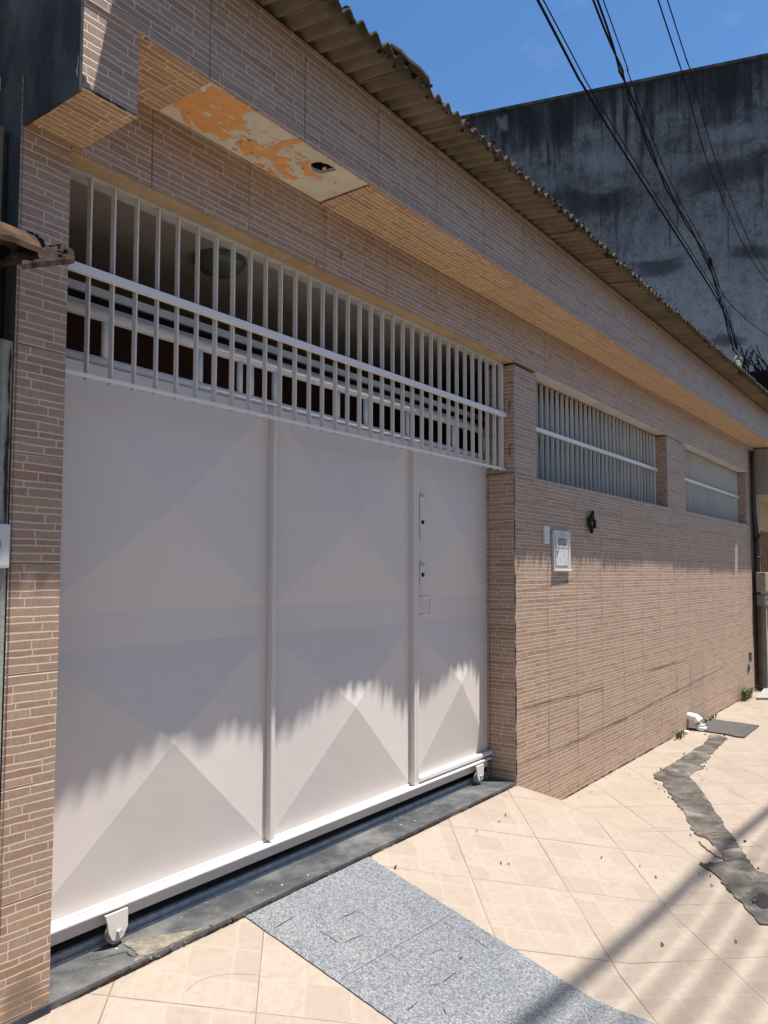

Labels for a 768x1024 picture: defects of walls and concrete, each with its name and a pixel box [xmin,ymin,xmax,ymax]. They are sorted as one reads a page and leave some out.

peeling [159,82,367,203]